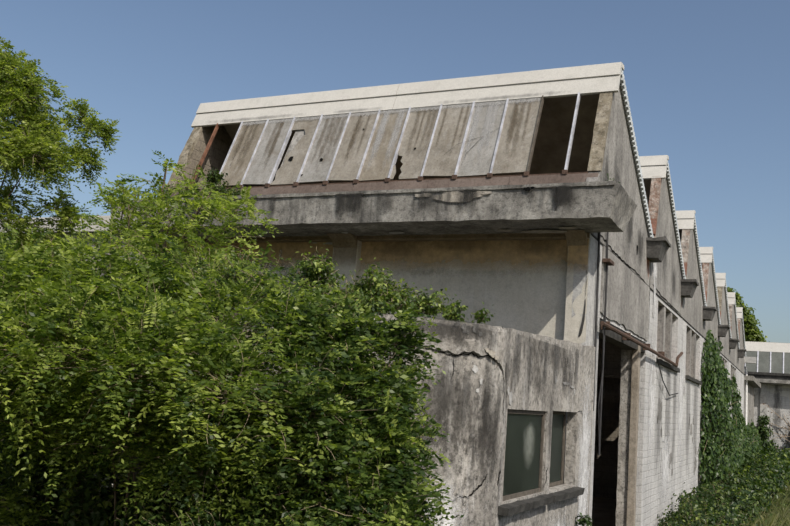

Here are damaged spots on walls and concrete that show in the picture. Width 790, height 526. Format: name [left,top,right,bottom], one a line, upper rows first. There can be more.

leakage [243,97,541,148]
crack [425,348,507,420]
leakage [482,392,500,444]
leakage [427,491,456,526]
crack [453,470,501,501]
leakage [578,466,588,526]